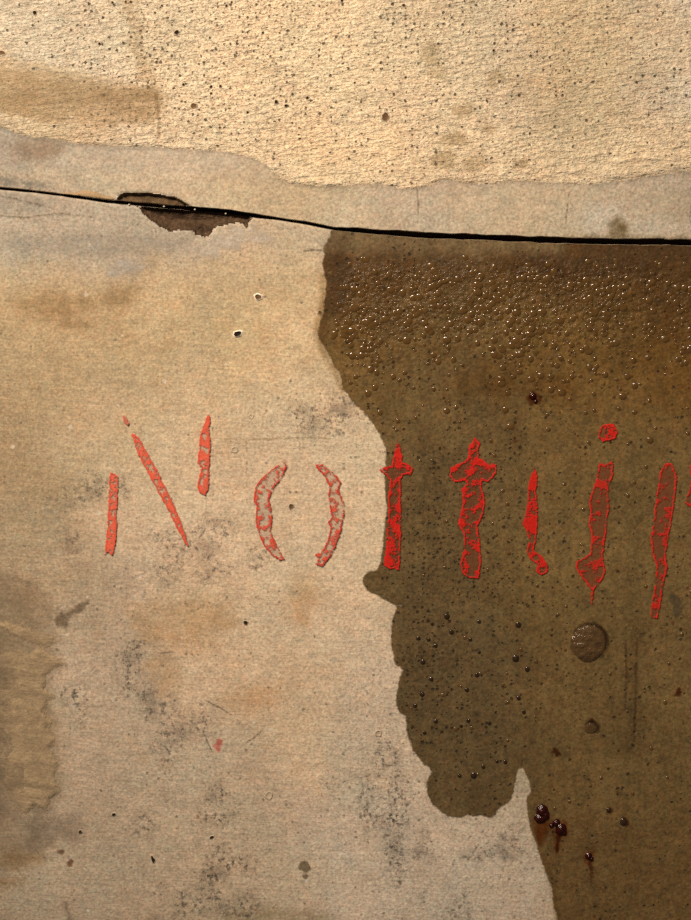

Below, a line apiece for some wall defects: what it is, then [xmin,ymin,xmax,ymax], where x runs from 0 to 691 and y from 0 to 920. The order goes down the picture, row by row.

spalling [63,191,252,237]
crack [0,187,691,246]
water stain [294,230,691,920]
rust [533,804,567,836]